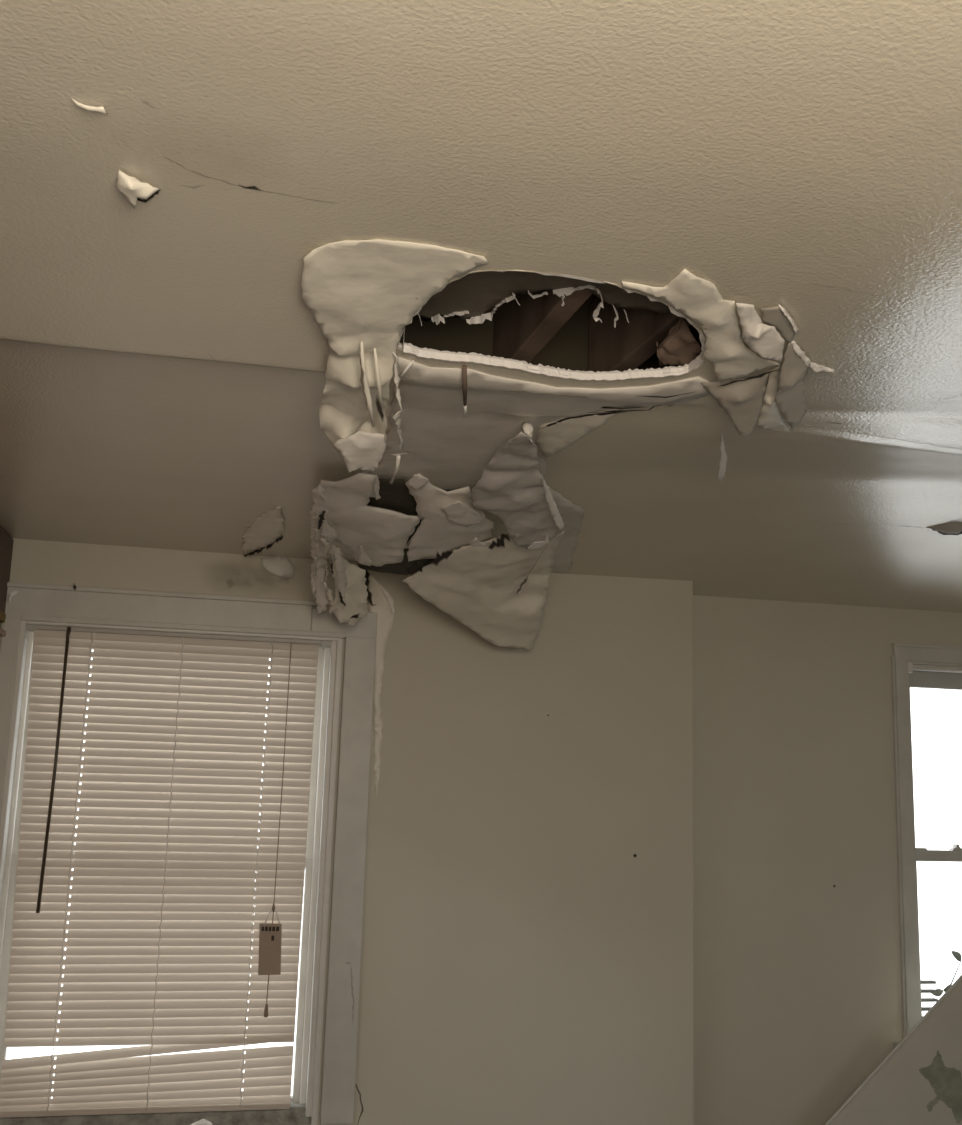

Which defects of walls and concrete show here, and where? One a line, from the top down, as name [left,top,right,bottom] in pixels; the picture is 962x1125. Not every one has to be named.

peeling [116,170,161,209]
peeling [241,506,295,578]
flaking render [301,239,835,798]